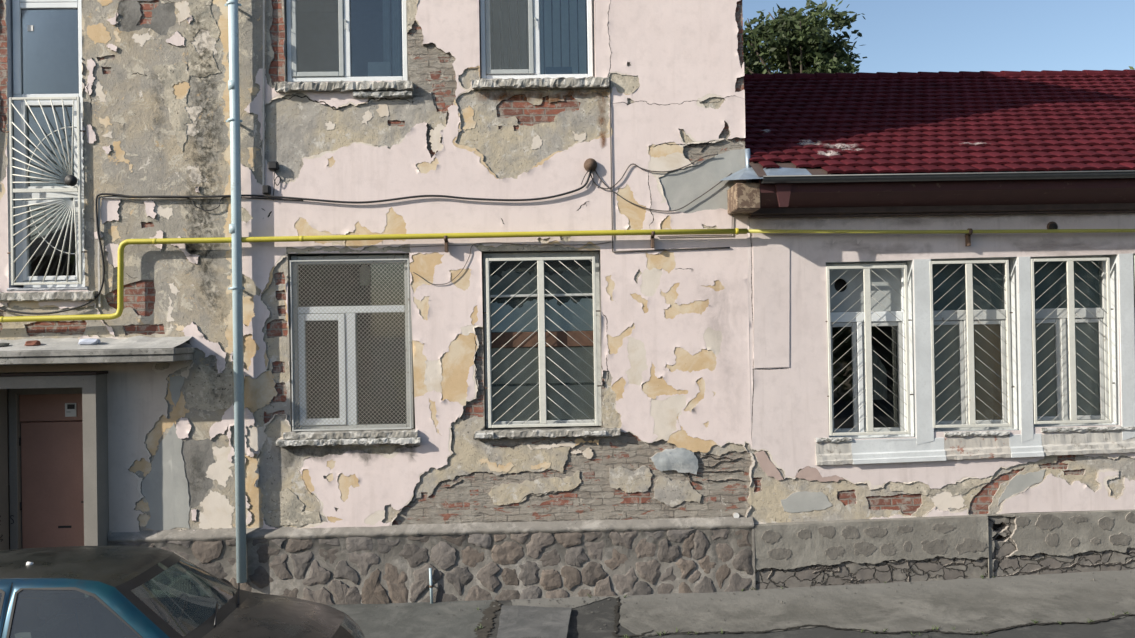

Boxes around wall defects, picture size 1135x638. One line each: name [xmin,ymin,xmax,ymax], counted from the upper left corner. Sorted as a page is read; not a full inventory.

leakage [189,21,217,306]
flaking render [0,0,640,532]
peeling [630,250,725,319]
flaking render [696,0,744,109]
flaking render [364,306,1135,526]